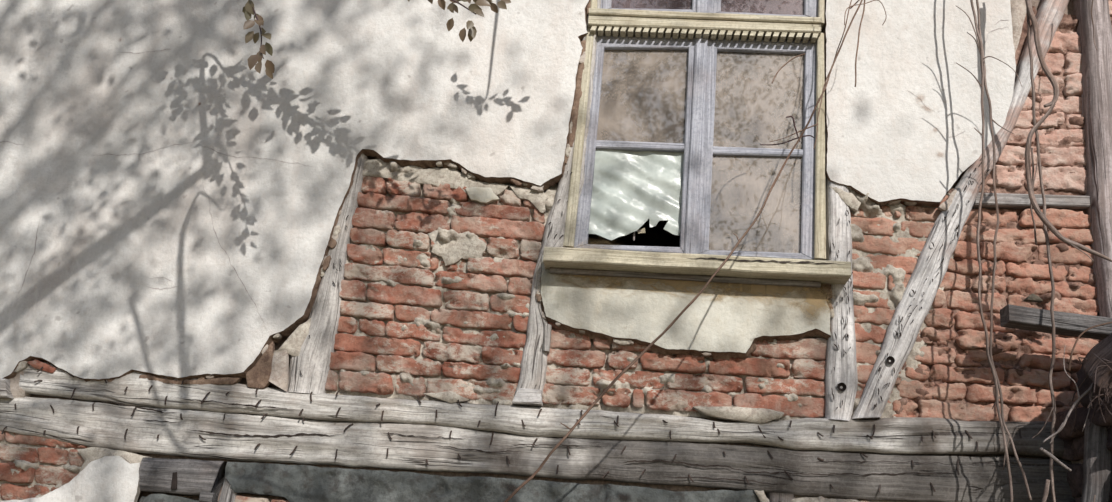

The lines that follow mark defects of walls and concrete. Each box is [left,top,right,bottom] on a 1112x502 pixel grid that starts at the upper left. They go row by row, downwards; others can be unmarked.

crack [202,182,266,328]
flaking render [3,0,591,389]
flaking render [829,187,861,212]